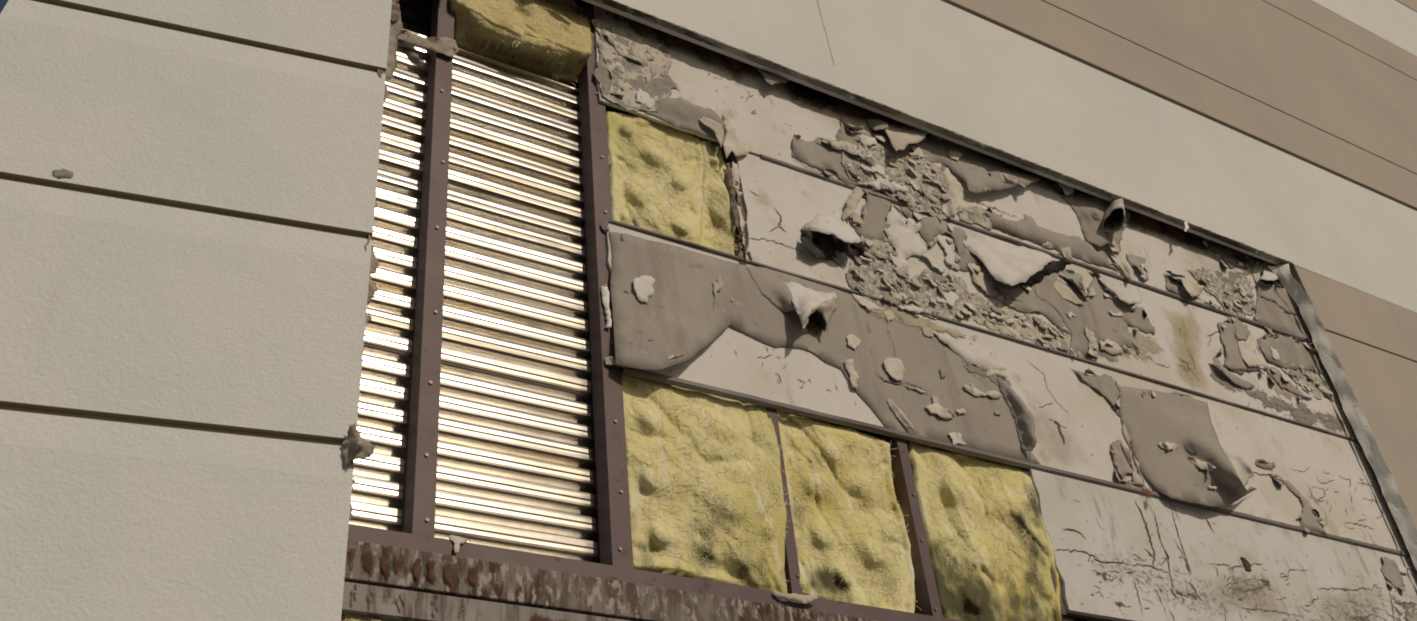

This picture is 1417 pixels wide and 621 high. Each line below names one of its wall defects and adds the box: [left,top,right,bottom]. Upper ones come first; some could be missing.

peeling [592,10,750,159]
peeling [609,124,1345,535]
crack [1208,331,1342,428]
crack [1056,374,1408,621]
rust [344,540,879,621]
peeling [1381,556,1417,621]